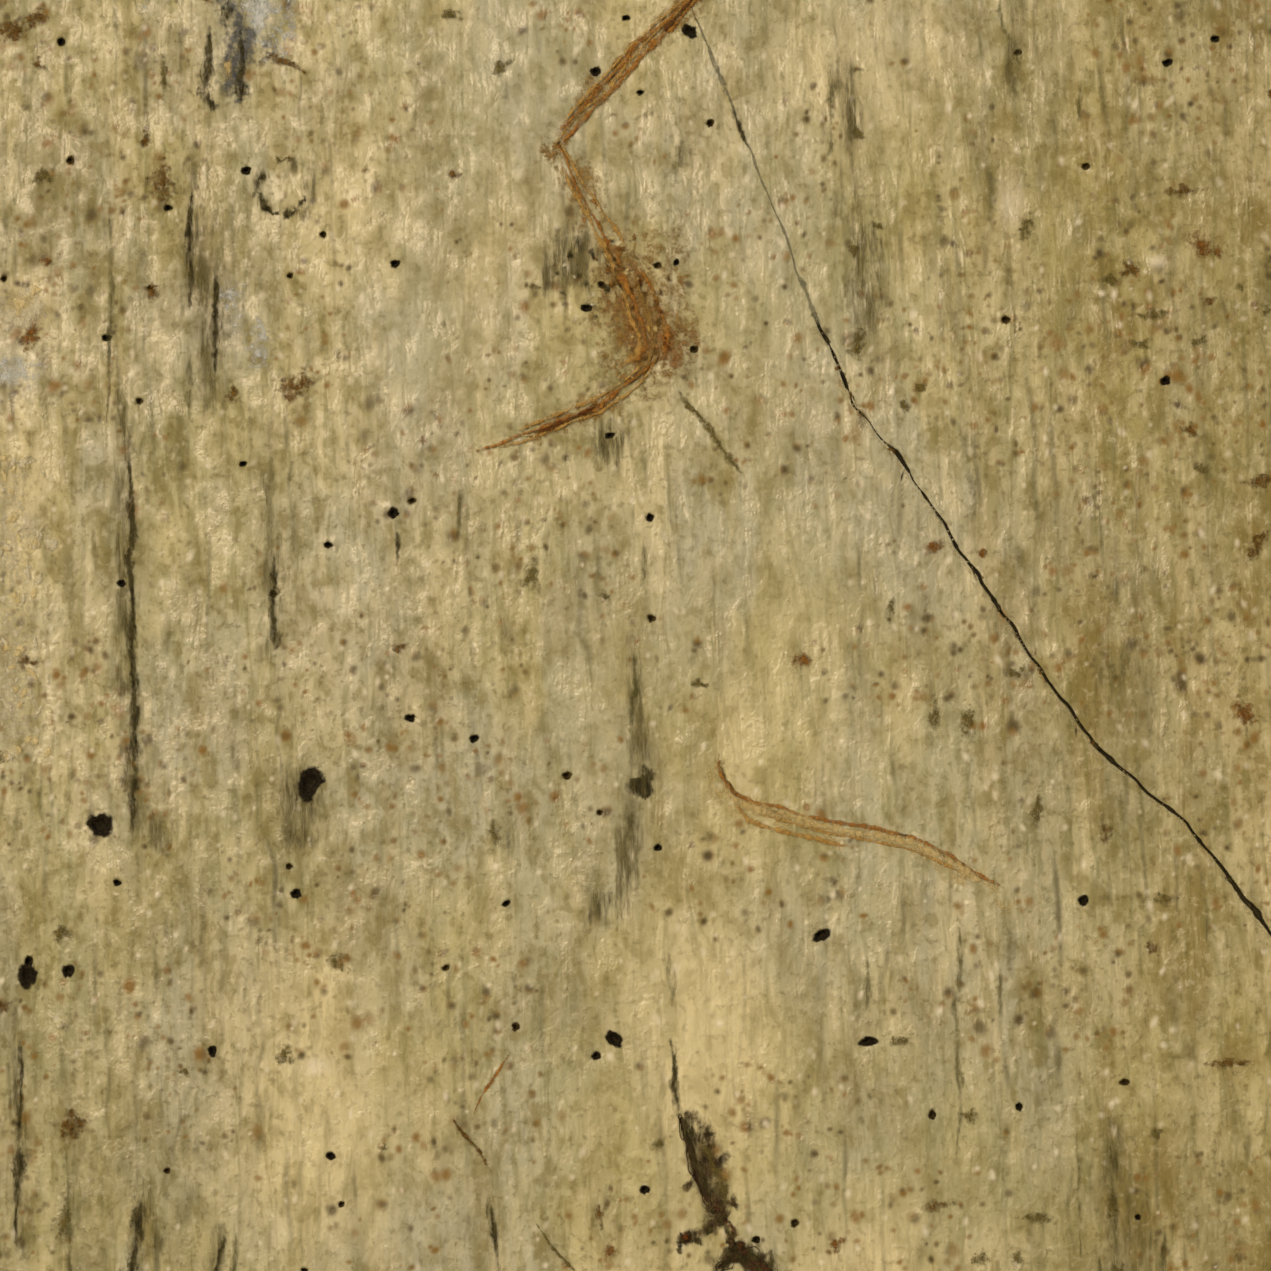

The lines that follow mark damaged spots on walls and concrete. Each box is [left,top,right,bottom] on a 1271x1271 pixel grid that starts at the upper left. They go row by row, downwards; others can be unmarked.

corrosion [476,0,701,452]
crack [680,0,1271,945]
corrosion [709,760,1003,908]
crack [677,1112,778,1271]